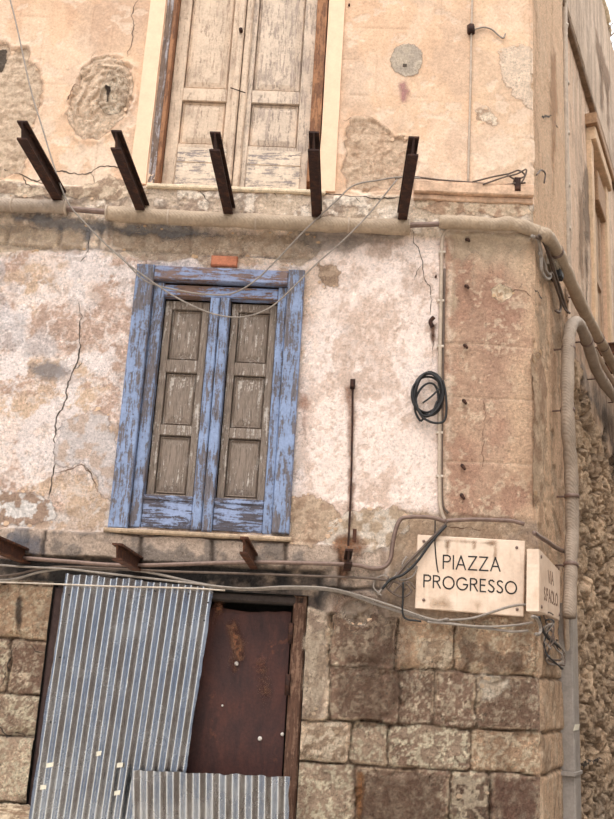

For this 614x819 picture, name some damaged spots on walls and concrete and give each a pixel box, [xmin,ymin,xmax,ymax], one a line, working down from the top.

spalling [0,44,51,198]
flaking render [62,175,130,201]
spalling [65,54,133,139]
spalling [341,116,408,193]
flaking render [498,44,533,110]
crack [49,306,98,495]
flaking render [290,493,412,555]